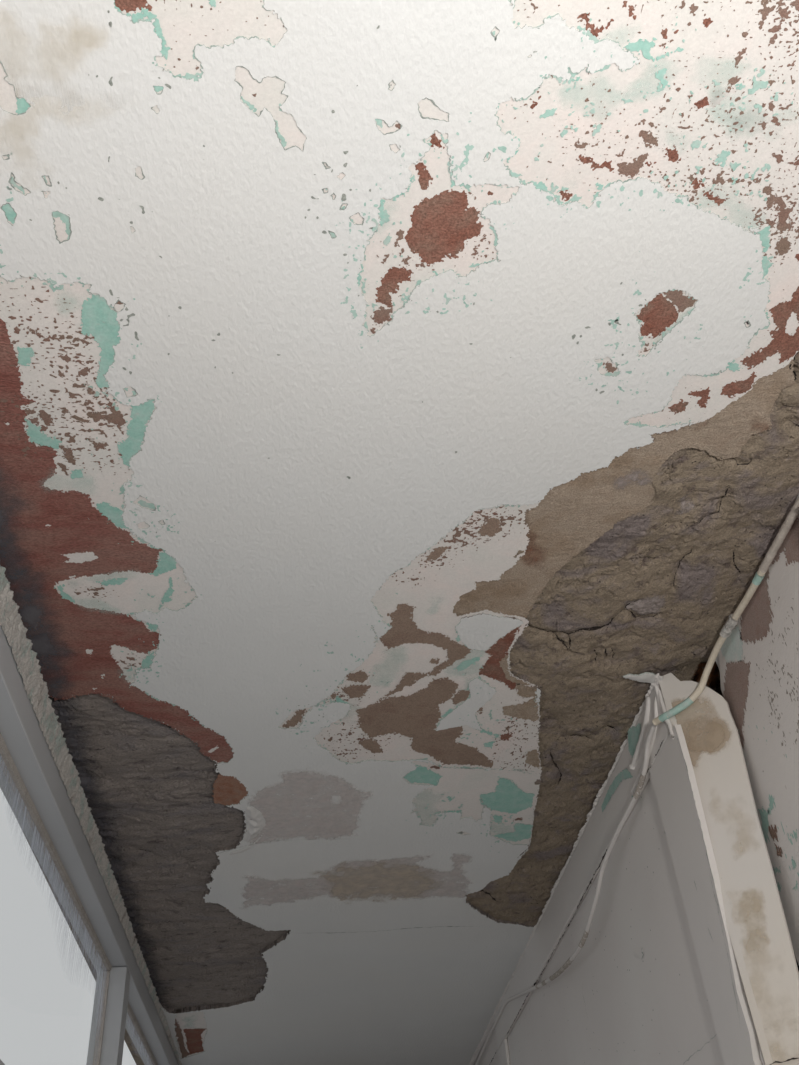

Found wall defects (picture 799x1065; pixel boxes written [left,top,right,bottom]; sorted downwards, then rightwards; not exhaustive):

peeling [114,0,287,81]
peeling [151,86,164,113]
peeling [235,66,307,151]
peeling [0,172,52,225]
peeling [52,211,72,244]
spalling [276,0,799,926]
spalling [0,245,287,1065]
water stain [672,700,730,765]